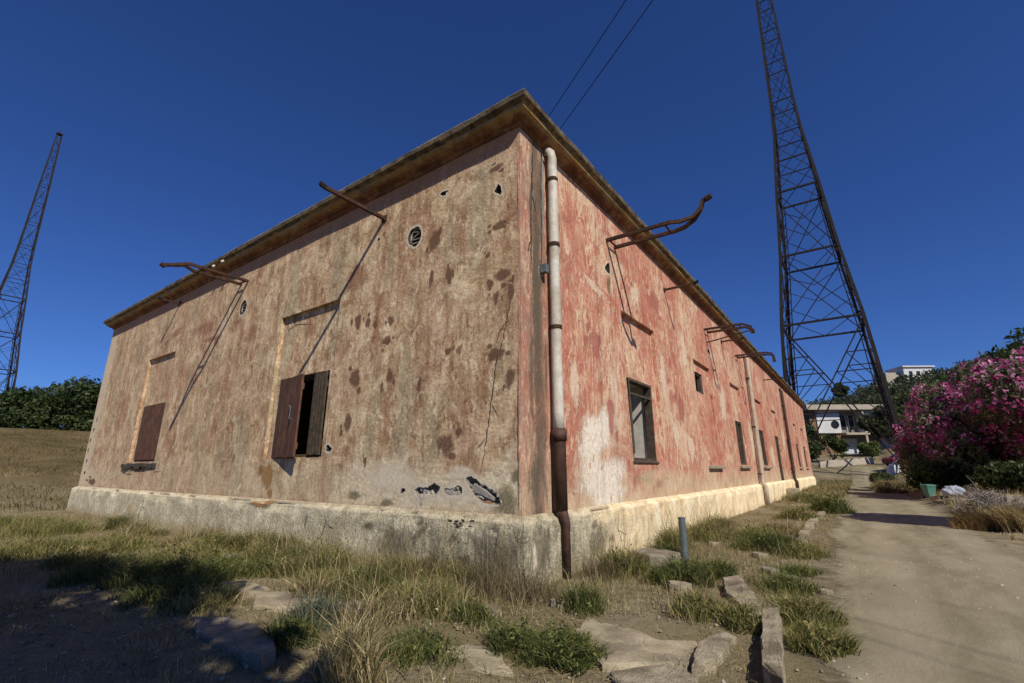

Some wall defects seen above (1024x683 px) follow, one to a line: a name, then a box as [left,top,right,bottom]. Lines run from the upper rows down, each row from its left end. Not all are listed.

leakage [530,186,547,408]
leakage [351,313,394,351]
leakage [487,343,511,362]
leakage [349,366,361,394]
crack [477,286,514,475]
leakage [503,369,515,391]
peeling [570,352,630,506]
leakage [512,455,539,498]
spalling [398,473,503,545]